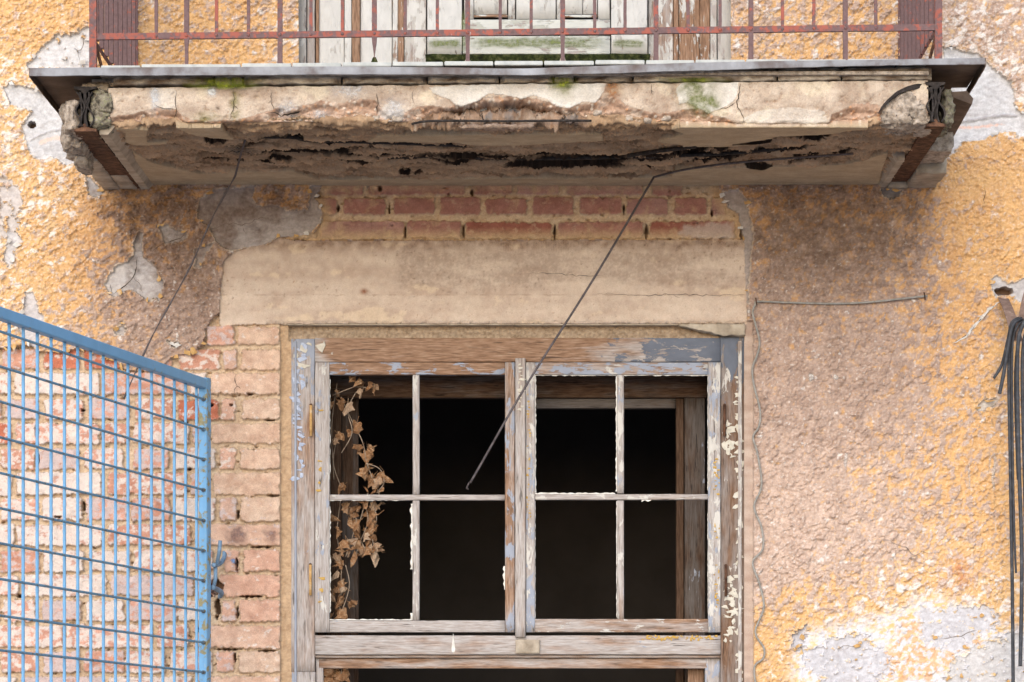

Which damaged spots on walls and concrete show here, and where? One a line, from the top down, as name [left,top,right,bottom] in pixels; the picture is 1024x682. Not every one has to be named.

peeling [26,23,89,68]
peeling [3,81,74,165]
peeling [942,46,1024,156]
peeling [0,173,24,268]
spalling [104,82,920,303]
peeling [713,376,744,509]
peeling [789,623,895,682]
peeling [917,602,1024,682]